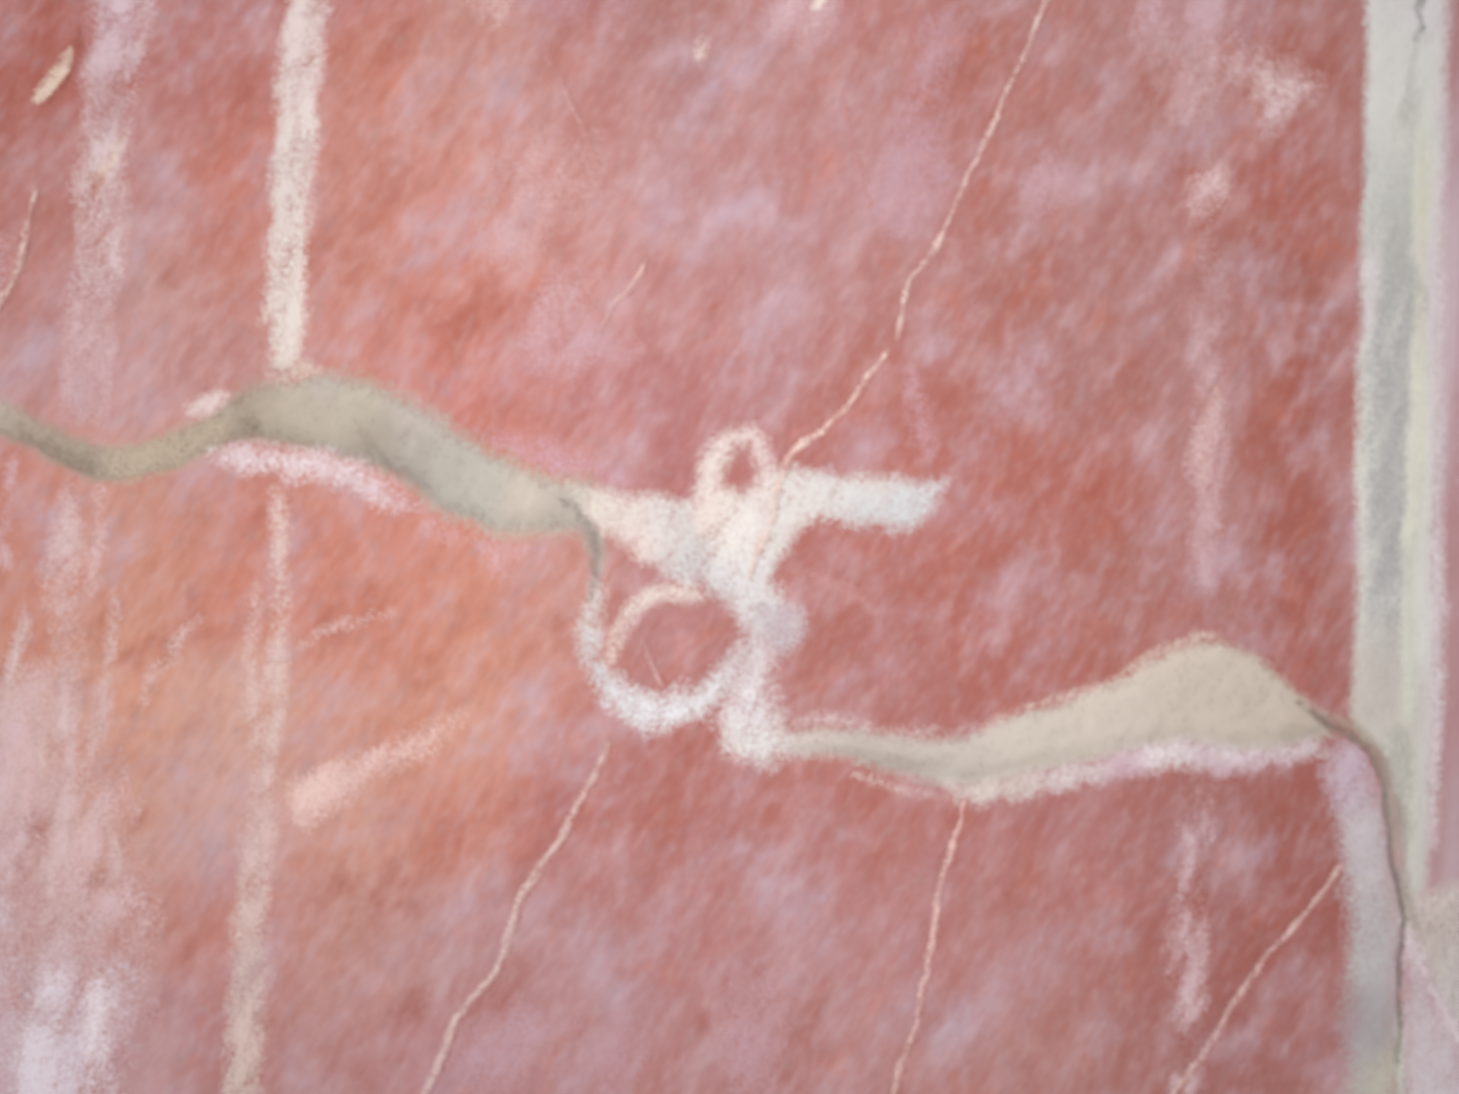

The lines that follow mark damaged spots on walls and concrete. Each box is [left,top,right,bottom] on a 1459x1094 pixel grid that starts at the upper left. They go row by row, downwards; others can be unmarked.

crack [0,187,41,311]
crack [598,255,650,334]
crack [747,0,1052,581]
crack [421,743,613,1094]
crack [769,629,1423,1094]